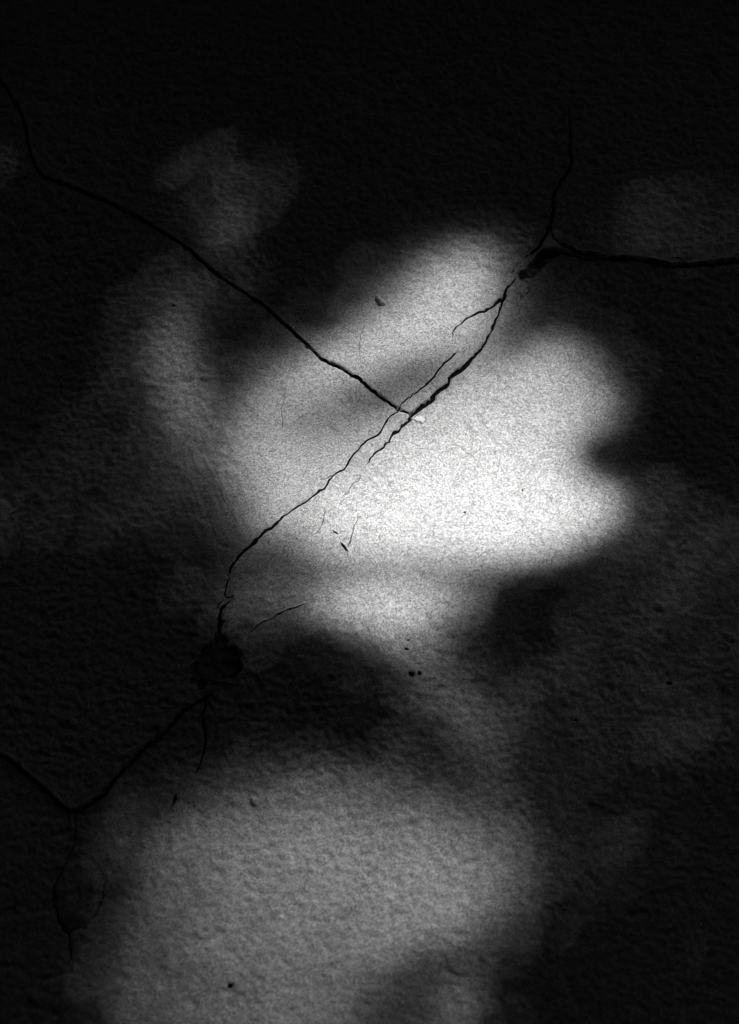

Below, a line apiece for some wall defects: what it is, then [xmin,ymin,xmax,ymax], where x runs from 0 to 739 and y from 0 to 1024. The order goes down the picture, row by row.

crack [0,74,739,642]
crack [0,696,216,815]